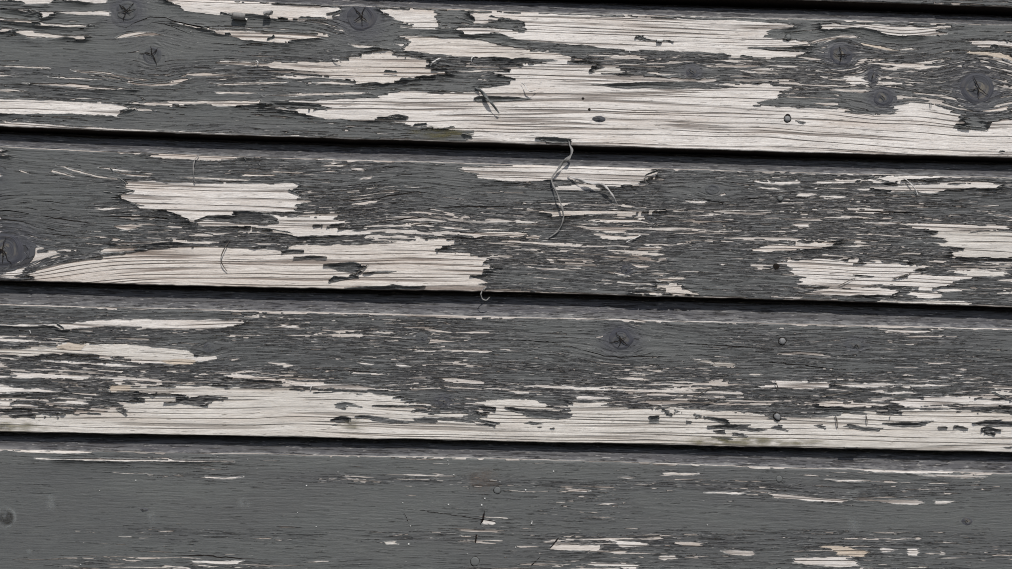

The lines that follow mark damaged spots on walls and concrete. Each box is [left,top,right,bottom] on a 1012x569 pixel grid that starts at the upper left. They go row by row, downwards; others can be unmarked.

peeling [0,0,110,39]
peeling [168,0,342,43]
peeling [0,8,1012,158]
peeling [750,176,1002,198]
peeling [0,154,700,295]
peeling [865,212,1012,258]
peeling [751,241,1012,305]
peeling [0,318,246,330]
peeling [0,337,1012,452]